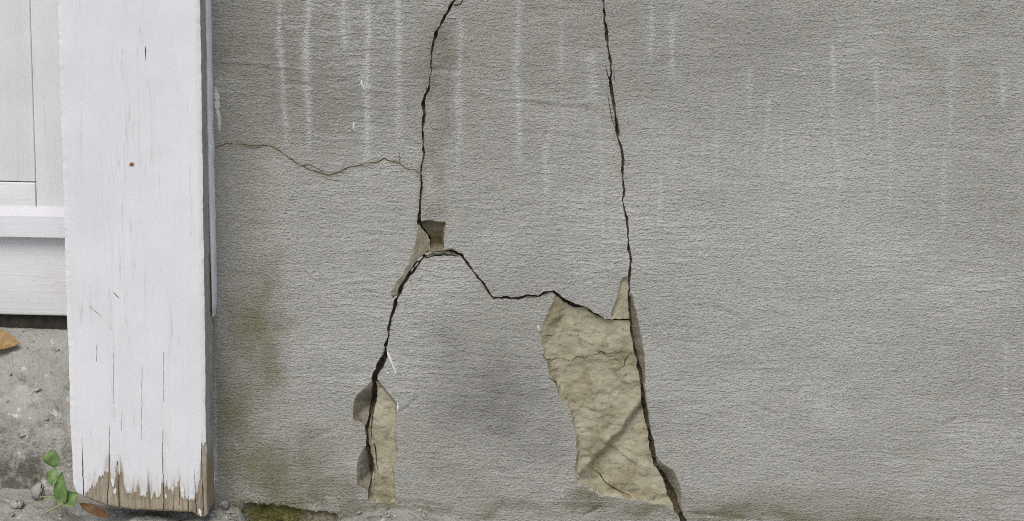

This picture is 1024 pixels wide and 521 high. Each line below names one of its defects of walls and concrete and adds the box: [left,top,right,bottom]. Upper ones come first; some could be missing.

leakage [303,0,312,141]
crack [215,0,463,225]
leakage [363,0,372,168]
flaking render [390,220,461,297]
crack [365,0,687,521]
peeling [84,442,208,517]
flaking render [353,380,399,503]
flaking render [537,277,681,511]